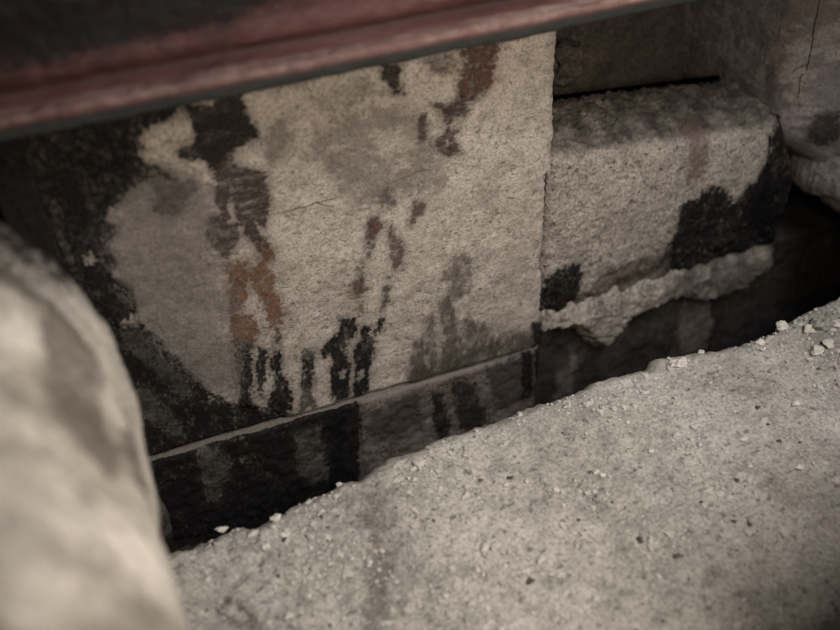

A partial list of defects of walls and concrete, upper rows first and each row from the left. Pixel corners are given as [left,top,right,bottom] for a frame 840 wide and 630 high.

corrosion [418,44,501,157]
crack [792,0,820,108]
corrosion [178,95,294,414]
leakage [573,169,780,304]